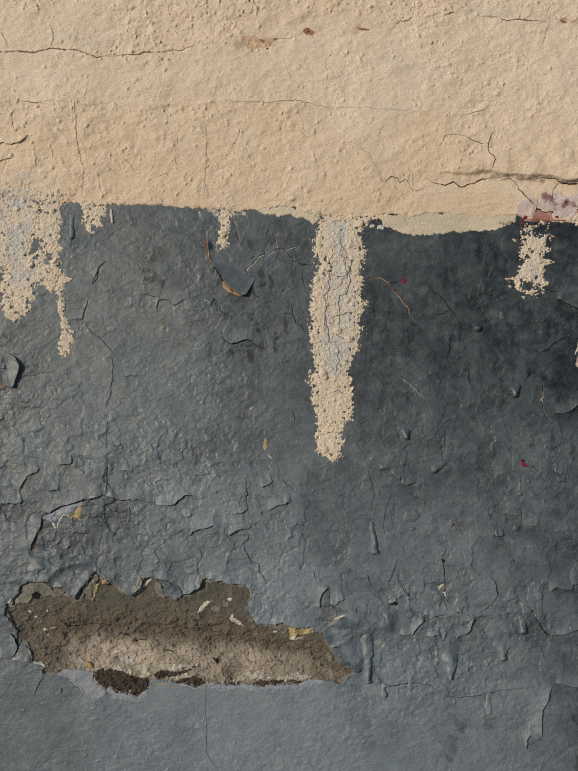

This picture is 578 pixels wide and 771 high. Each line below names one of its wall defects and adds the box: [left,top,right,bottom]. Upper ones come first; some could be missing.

crack [0,26,218,58]
crack [357,127,578,212]
peeling [515,192,578,221]
peeling [203,237,264,299]
leakage [305,209,372,463]
peeling [555,391,578,415]
spalling [0,459,378,701]
peeling [399,605,476,641]